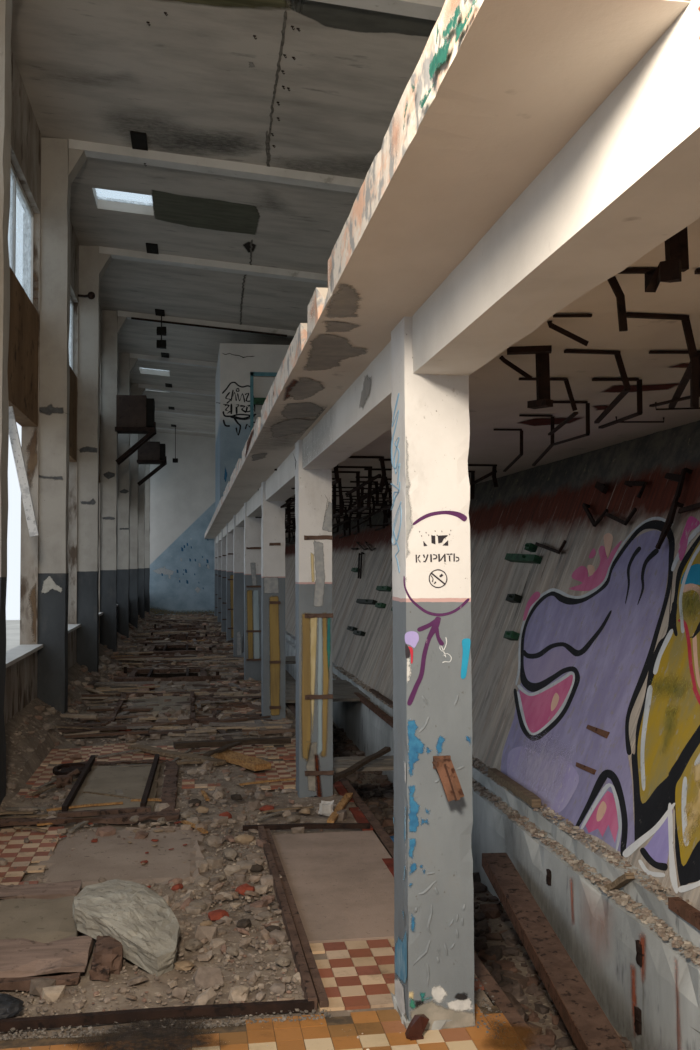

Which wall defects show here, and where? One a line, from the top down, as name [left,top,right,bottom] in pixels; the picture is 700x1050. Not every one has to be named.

crack [265,10,287,167]
peeling [393,0,478,141]
crack [223,240,254,358]
peeling [271,284,366,437]
peeling [360,376,371,408]
peeling [393,720,445,886]
peeling [395,910,475,1030]
corrosion [631,936,645,1033]